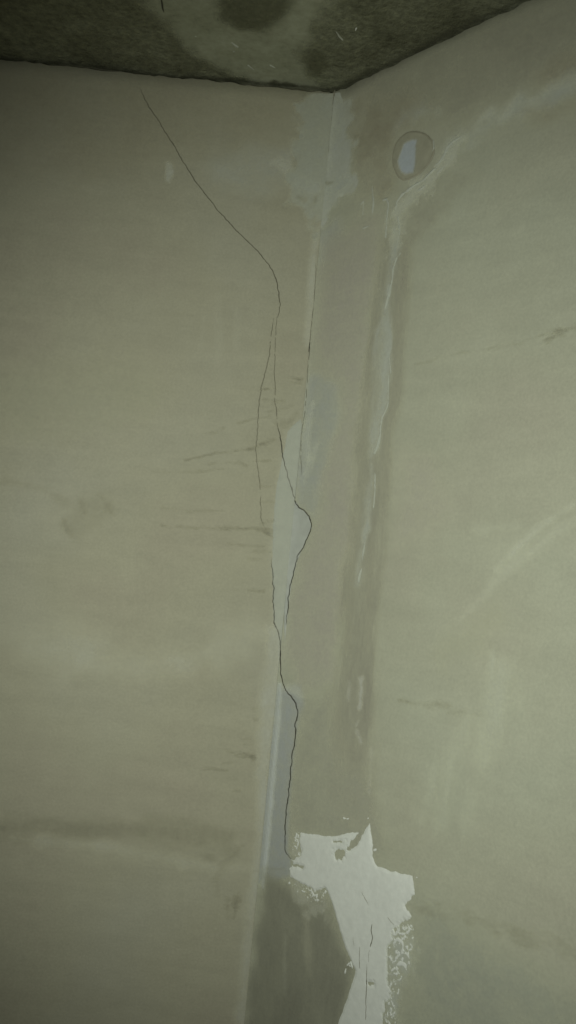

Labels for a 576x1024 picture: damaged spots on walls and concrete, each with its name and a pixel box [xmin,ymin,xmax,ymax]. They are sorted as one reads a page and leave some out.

crack [142,94,316,858]
peeling [384,924,414,1024]